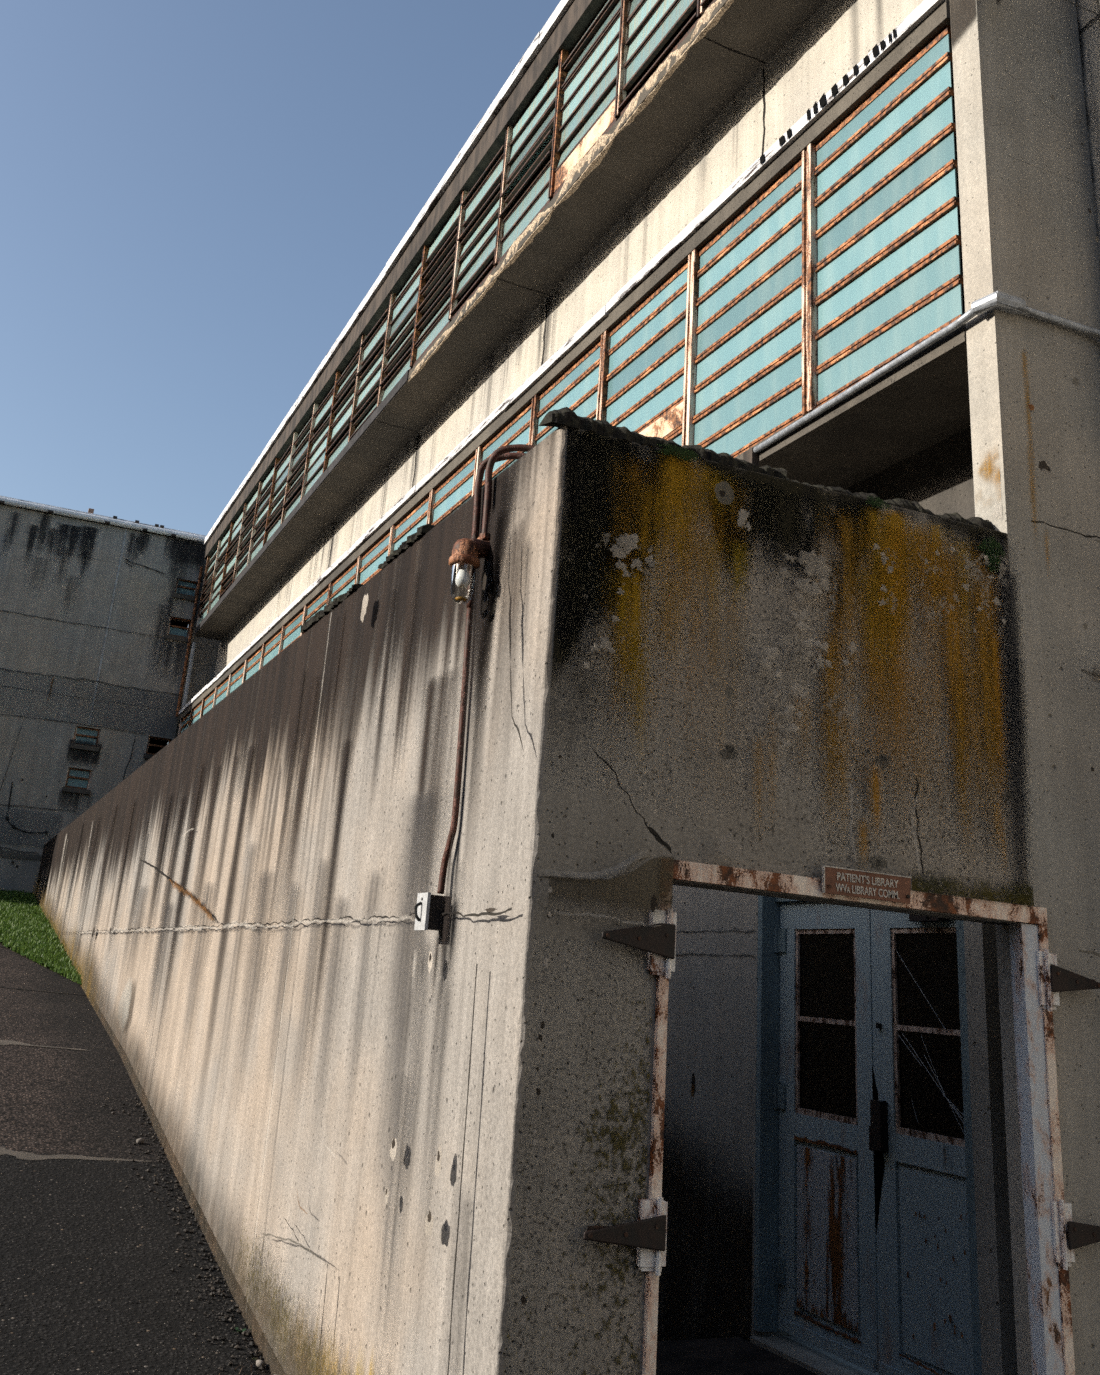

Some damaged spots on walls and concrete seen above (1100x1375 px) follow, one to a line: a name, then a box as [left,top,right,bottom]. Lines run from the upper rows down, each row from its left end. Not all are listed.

damp [949,0,976,46]
crack [1080,15,1099,32]
damp [10,513,97,572]
damp [656,455,738,573]
damp [831,508,942,667]
crack [1031,520,1100,543]
damp [988,539,1025,877]
damp [32,431,553,1139]
crack [591,747,672,854]
corrosion [794,1135,860,1343]